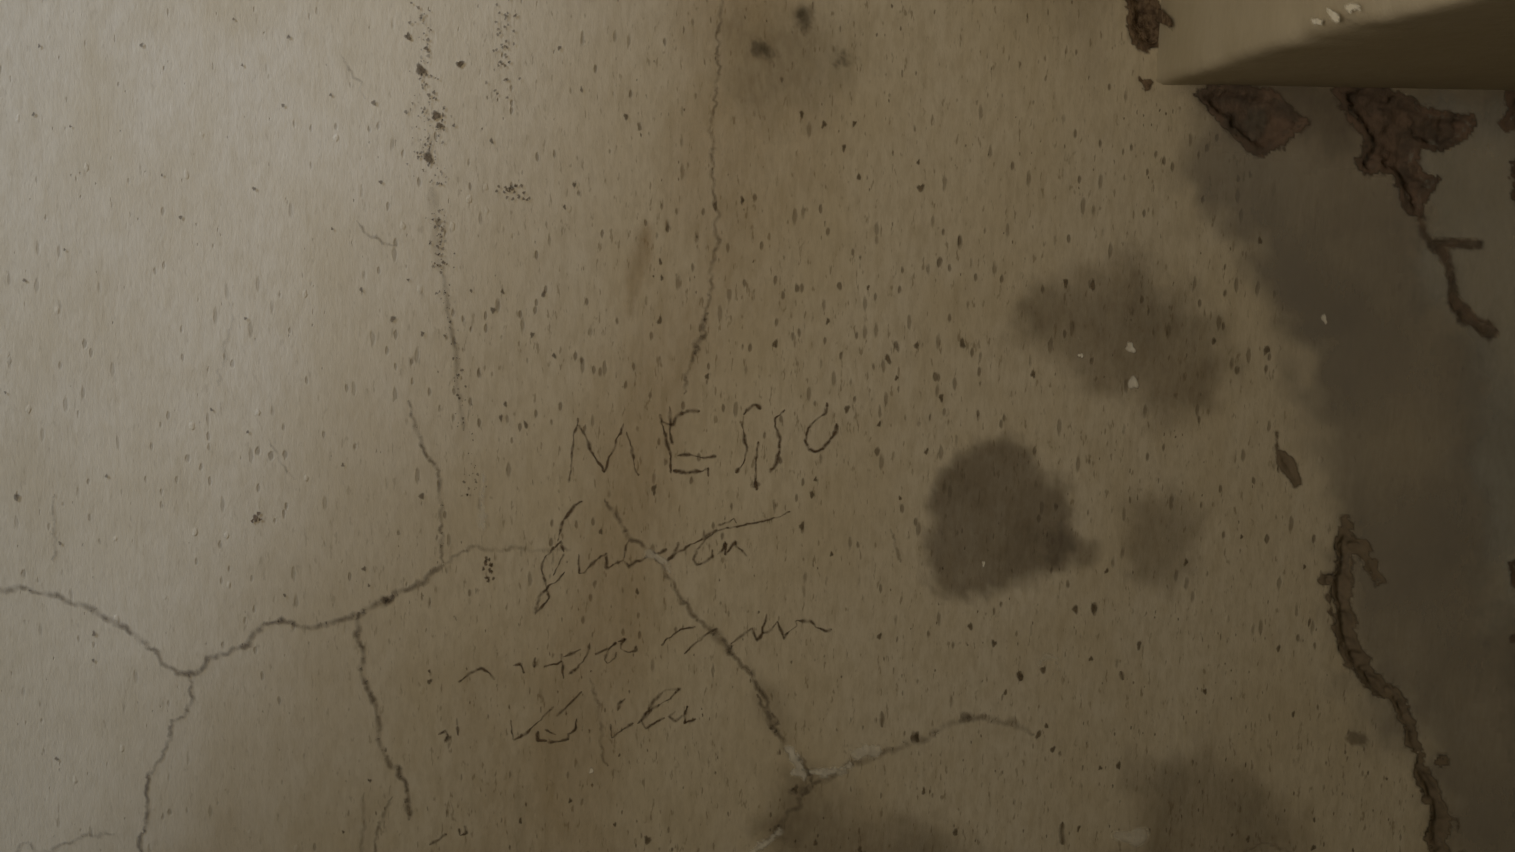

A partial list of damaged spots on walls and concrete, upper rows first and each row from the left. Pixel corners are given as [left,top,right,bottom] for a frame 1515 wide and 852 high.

flaking render [1193,85,1310,158]
flaking render [1331,87,1477,218]
flaking render [1498,90,1515,132]
crack [405,2,477,496]
crack [183,618,282,696]
crack [342,569,436,718]
crack [734,657,915,780]
crack [397,767,411,816]